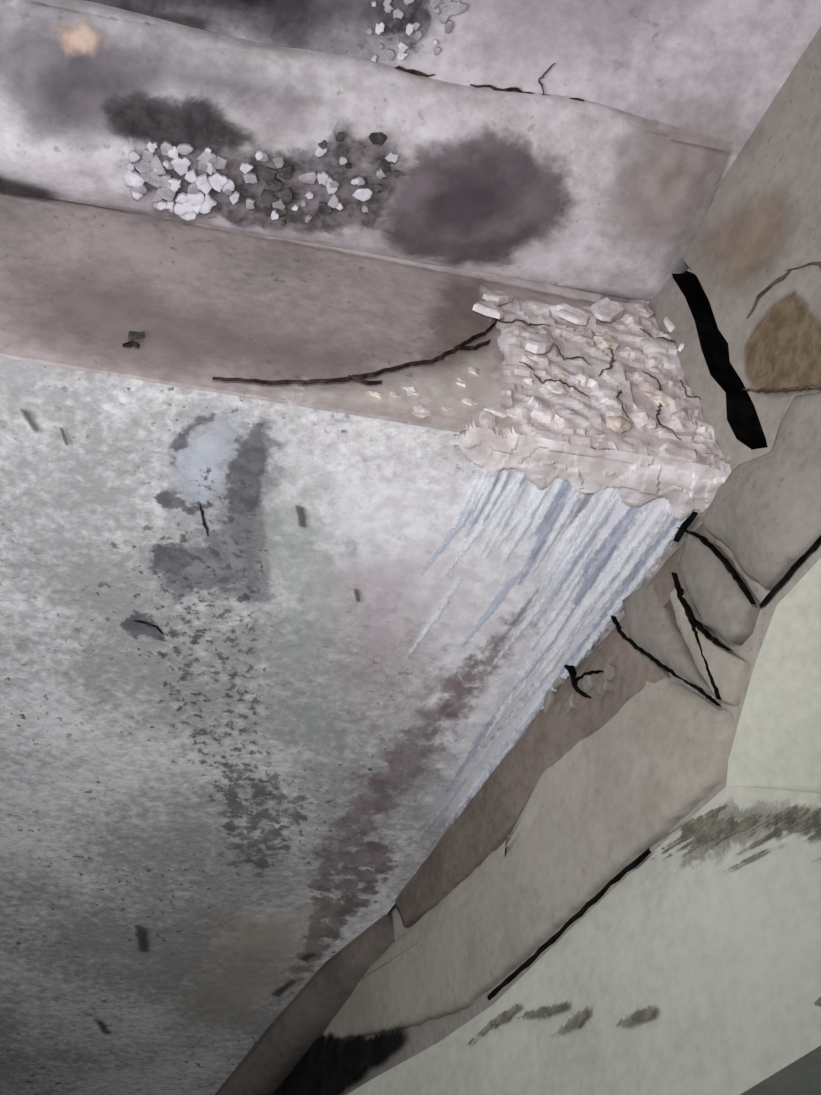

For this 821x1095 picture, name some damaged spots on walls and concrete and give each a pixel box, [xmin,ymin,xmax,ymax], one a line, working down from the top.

water stain [0,29,265,152]
water stain [87,0,430,49]
peeling [366,0,467,62]
peeling [123,128,403,234]
crack [212,318,498,385]
water stain [126,132,602,427]
crack [672,259,768,450]
crack [746,262,821,319]
crack [673,511,756,605]
water stain [121,414,700,877]
crack [611,572,732,707]
corrosion [290,636,508,981]